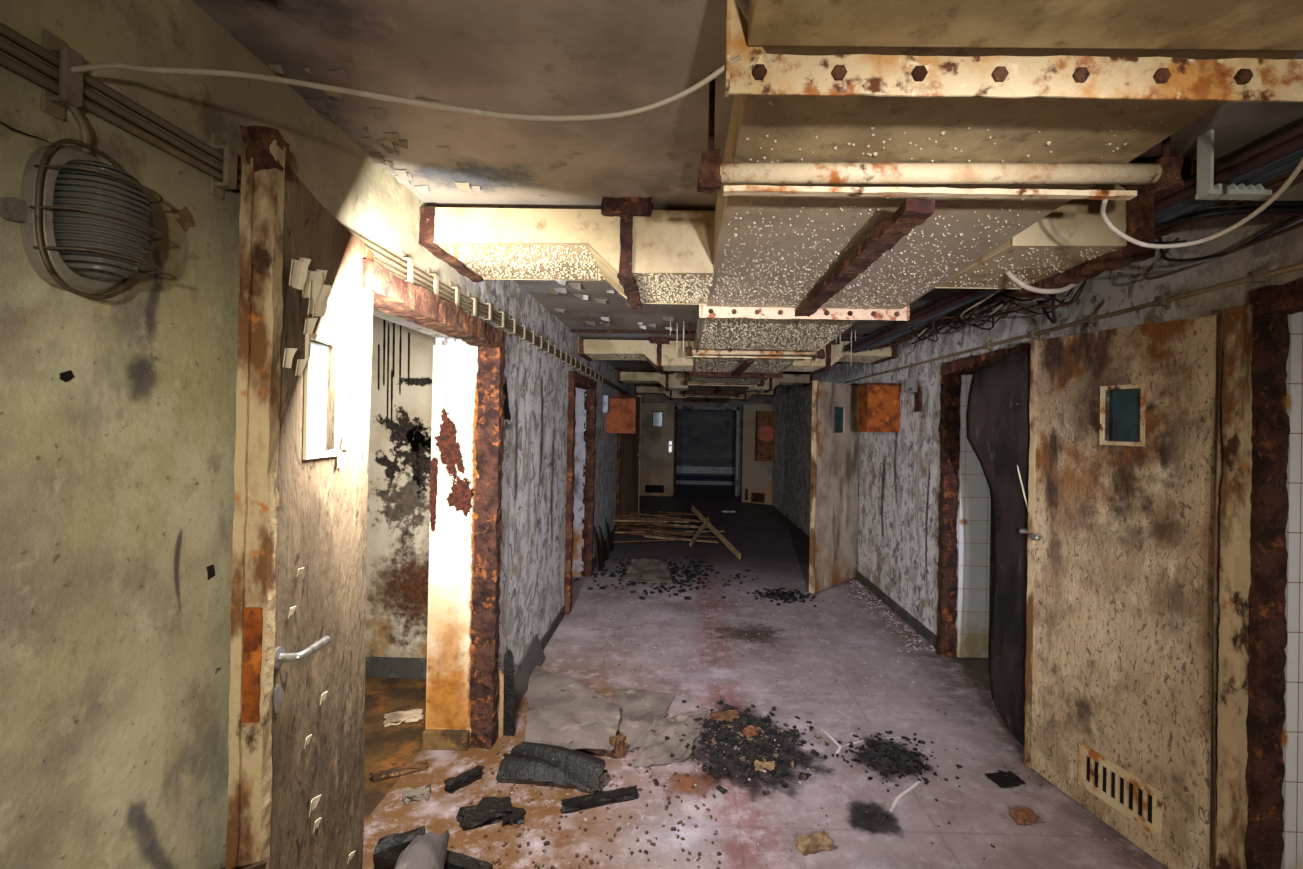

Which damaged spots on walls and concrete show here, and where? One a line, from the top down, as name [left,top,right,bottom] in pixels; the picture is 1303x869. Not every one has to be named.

corrosion [468,374,479,717]